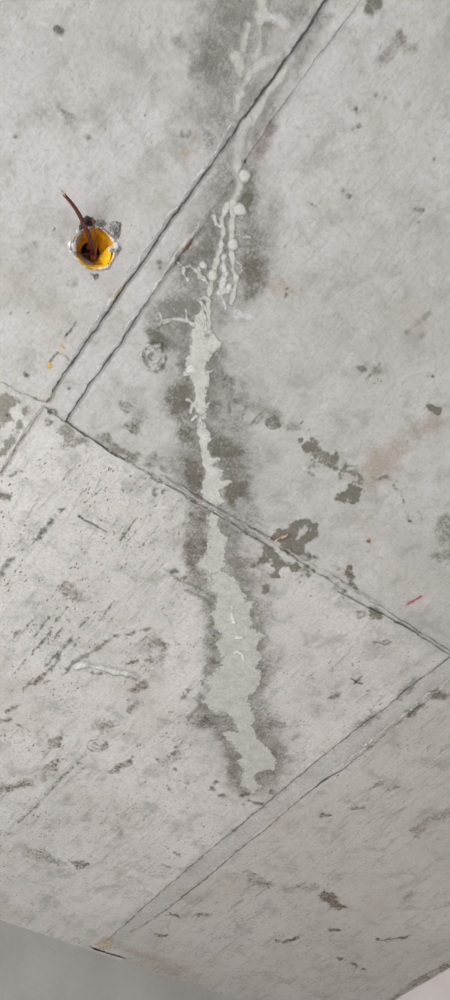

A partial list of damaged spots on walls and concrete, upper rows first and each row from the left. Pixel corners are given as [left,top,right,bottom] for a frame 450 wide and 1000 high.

water stain [218,166,253,222]
water stain [154,213,263,352]
water stain [167,376,196,442]
water stain [179,457,206,502]
water stain [205,399,248,505]
water stain [184,541,207,570]